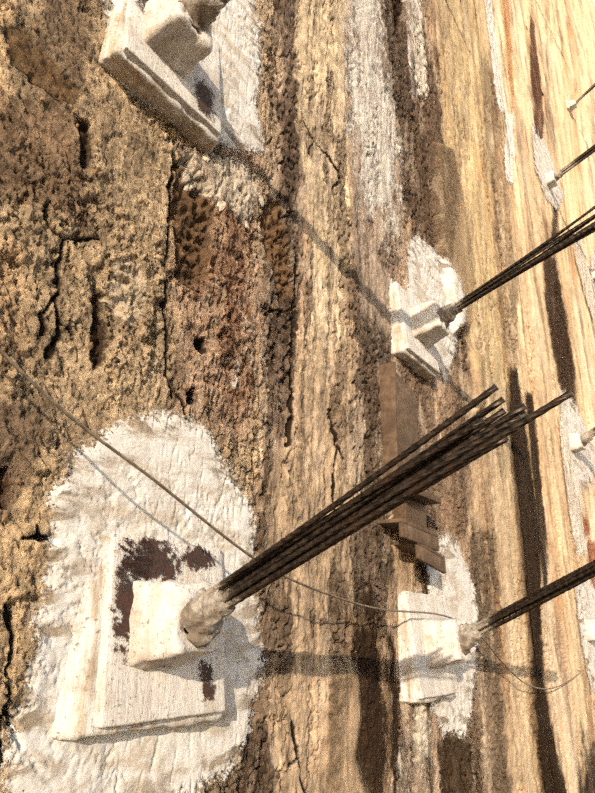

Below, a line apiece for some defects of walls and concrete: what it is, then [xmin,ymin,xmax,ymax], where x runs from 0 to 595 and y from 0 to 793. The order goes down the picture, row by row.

rust [195,78,217,124]
damp [343,0,402,236]
crack [37,205,95,359]
rust [108,536,216,665]
rust [582,515,595,562]
crack [0,604,16,766]
rust [199,657,216,706]
crack [288,720,305,793]